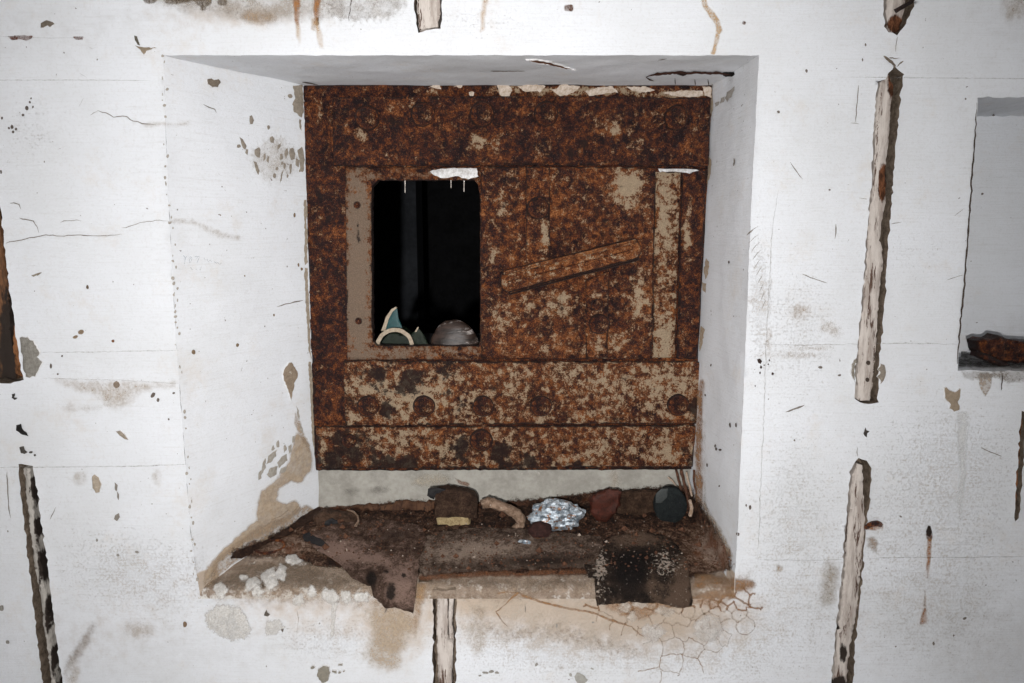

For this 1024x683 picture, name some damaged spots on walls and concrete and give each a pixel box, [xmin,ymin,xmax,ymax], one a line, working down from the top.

corrosion [702,0,722,55]
peeling [288,85,304,129]
peeling [237,125,305,182]
spalling [877,363,886,384]
water stain [205,416,369,601]
crack [495,587,763,675]